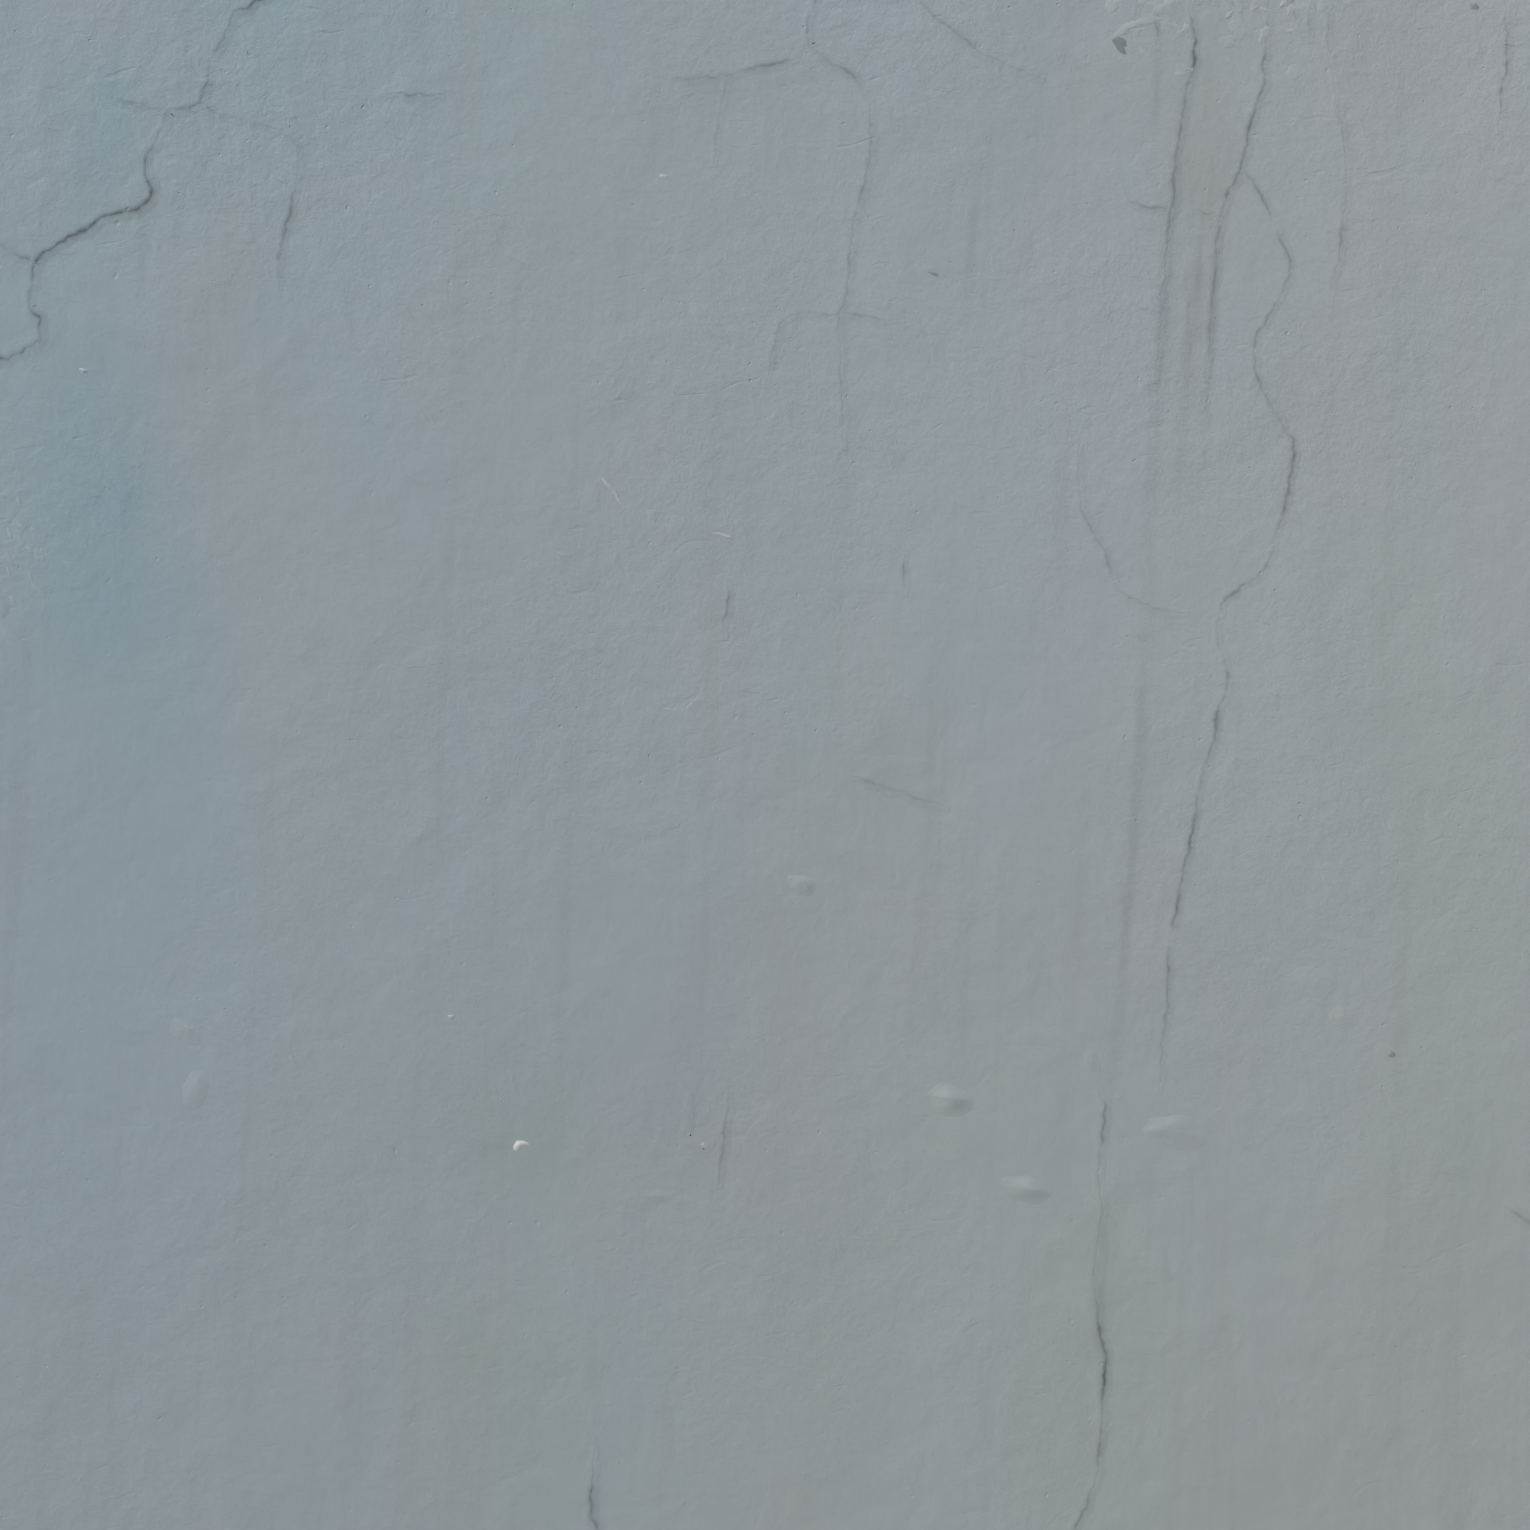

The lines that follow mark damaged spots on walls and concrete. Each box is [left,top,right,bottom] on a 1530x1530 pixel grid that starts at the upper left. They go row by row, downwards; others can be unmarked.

crack [0,0,307,369]
crack [1120,0,1302,1094]
crack [582,1446,605,1530]
crack [1068,1086,1115,1530]